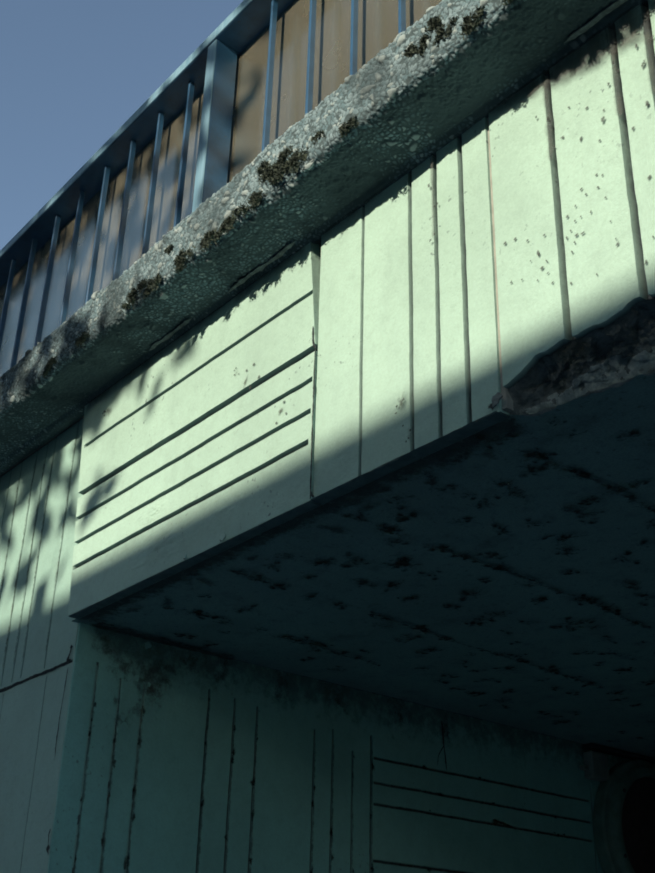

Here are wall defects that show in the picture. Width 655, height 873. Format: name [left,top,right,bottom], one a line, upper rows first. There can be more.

spalling [488,299,655,416]
leakage [81,418,523,660]